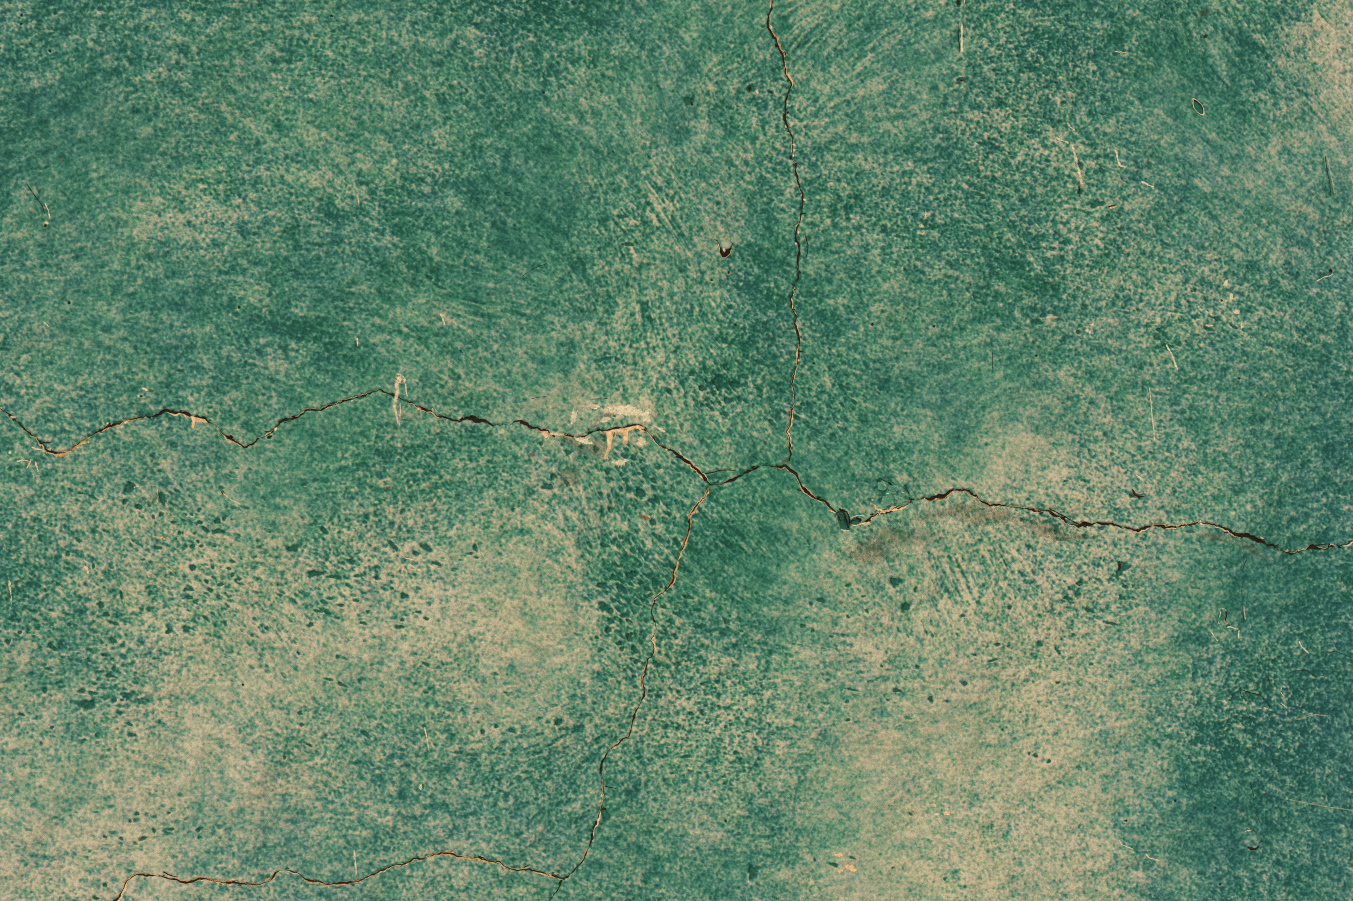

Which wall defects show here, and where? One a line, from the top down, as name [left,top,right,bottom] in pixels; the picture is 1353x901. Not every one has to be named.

crack [0,0,851,901]
crack [863,487,1353,555]
crack [1239,651,1351,733]